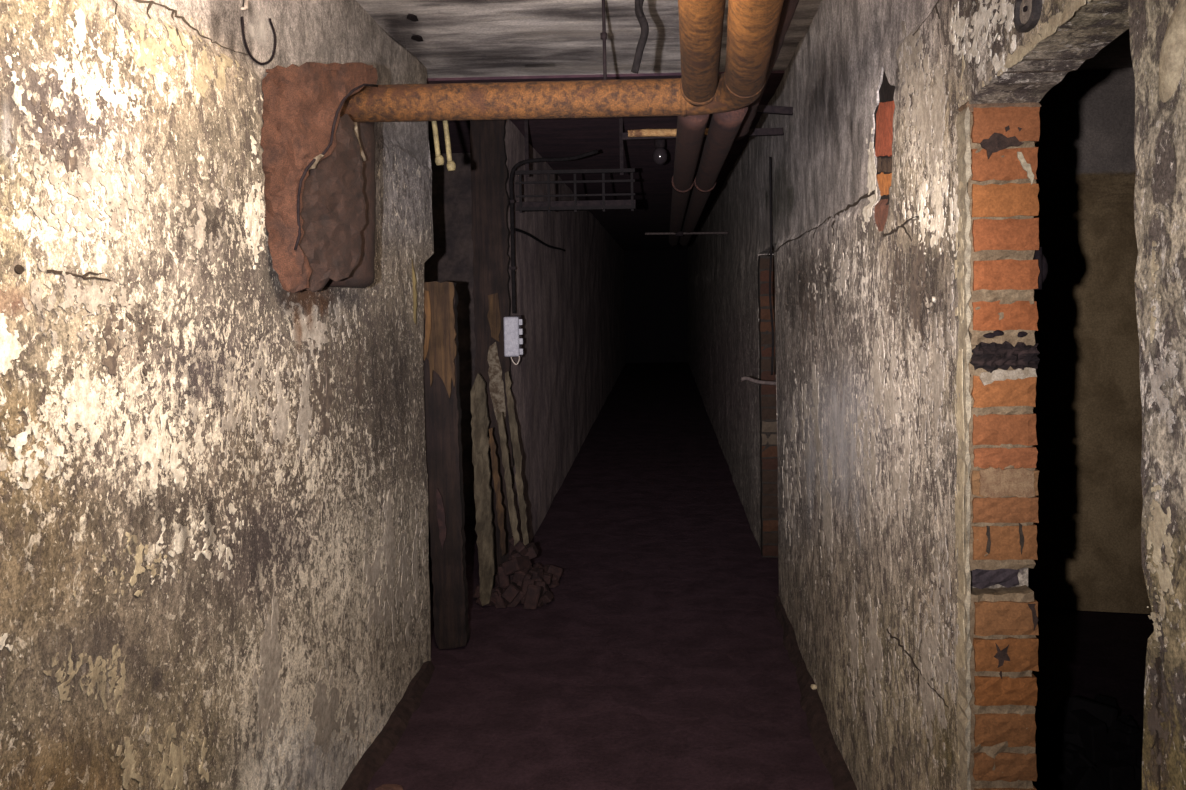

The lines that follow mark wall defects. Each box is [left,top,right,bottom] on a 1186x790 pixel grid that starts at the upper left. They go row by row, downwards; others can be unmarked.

crack [113,0,249,56]
crack [767,190,875,256]
crack [882,216,918,241]
peeling [782,0,1091,777]